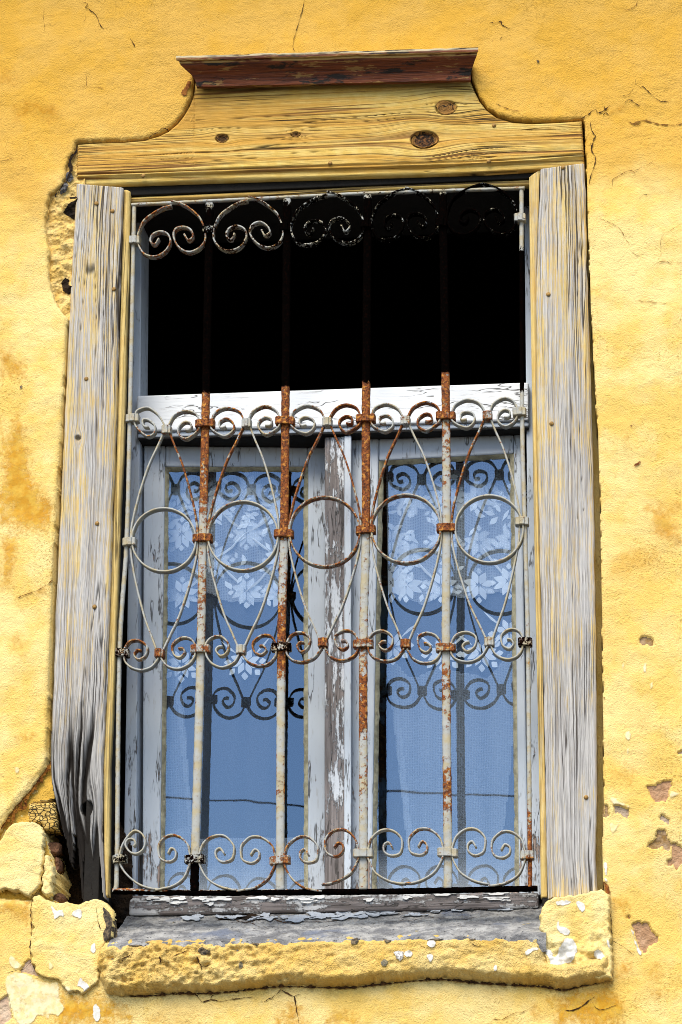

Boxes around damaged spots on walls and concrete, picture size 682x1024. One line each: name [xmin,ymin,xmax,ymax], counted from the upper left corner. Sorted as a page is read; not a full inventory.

crack [581,80,682,197]
spalling [46,147,85,321]
spalling [0,766,54,841]
spalling [0,828,83,918]
spalling [111,812,135,923]
flaking render [603,798,629,832]
flaking render [647,781,679,802]
flaking render [647,815,682,870]
peeling [146,892,513,923]
flaking render [627,916,658,955]
peeling [0,956,89,1024]